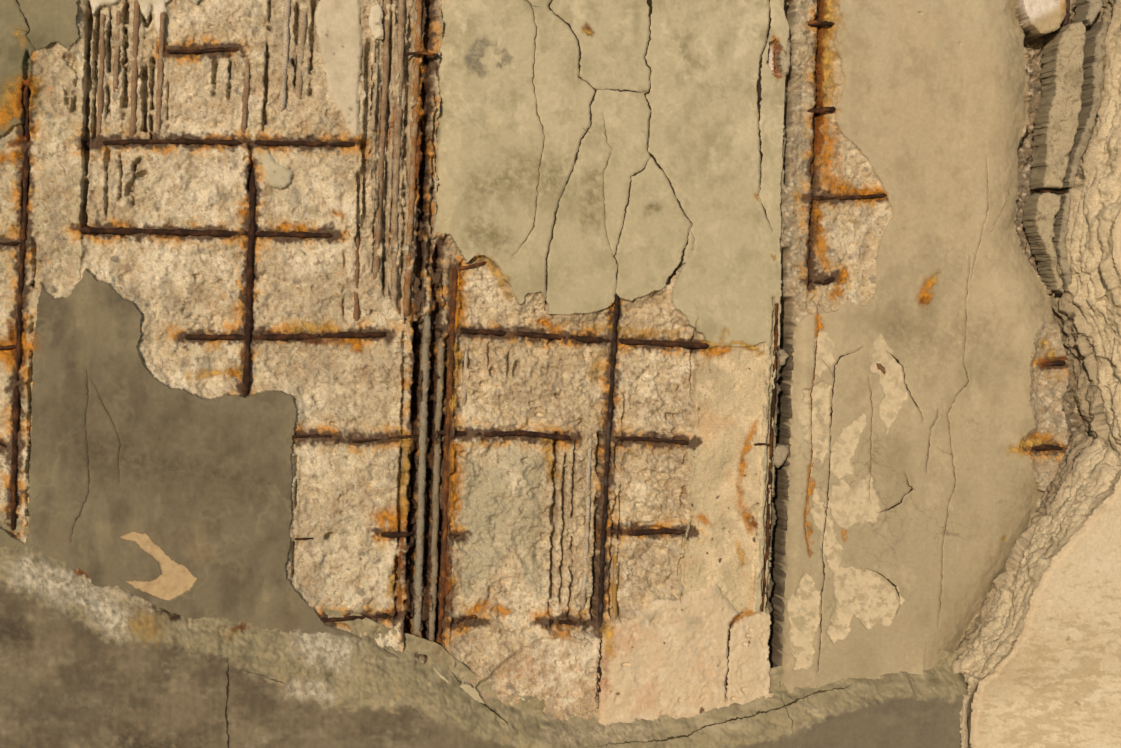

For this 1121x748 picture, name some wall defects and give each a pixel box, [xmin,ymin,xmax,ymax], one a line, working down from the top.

rust [0,76,38,164]
rust [415,49,430,234]
crack [512,0,695,311]
crack [756,0,773,231]
spalling [804,0,893,316]
rust [812,0,887,199]
rust [0,321,33,364]
spalling [0,0,791,721]
rust [375,330,437,633]
rust [737,425,758,531]
peeling [785,330,908,671]
crack [951,0,1121,748]